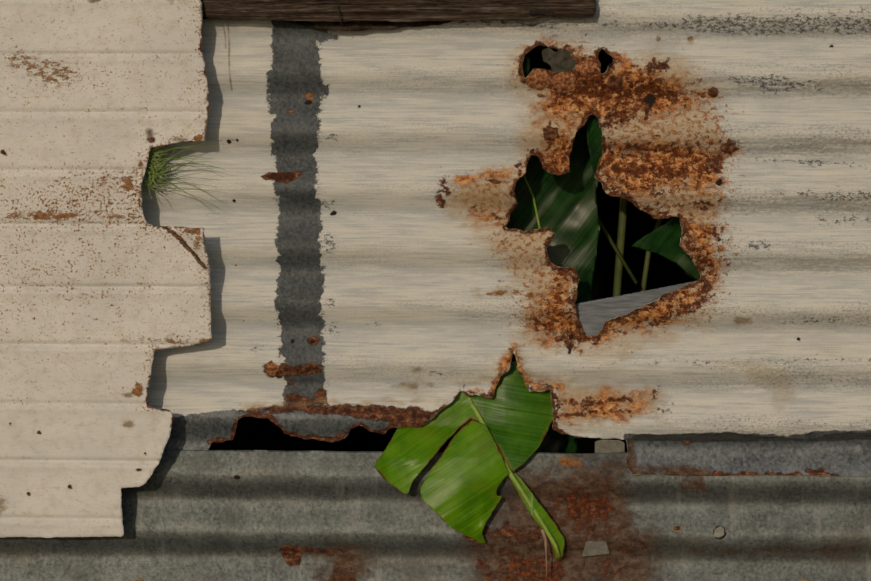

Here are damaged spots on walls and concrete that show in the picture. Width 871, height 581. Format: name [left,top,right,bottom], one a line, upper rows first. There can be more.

corrosion [4,51,79,84]
corrosion [2,209,139,221]
corrosion [207,30,749,445]
corrosion [463,439,839,581]